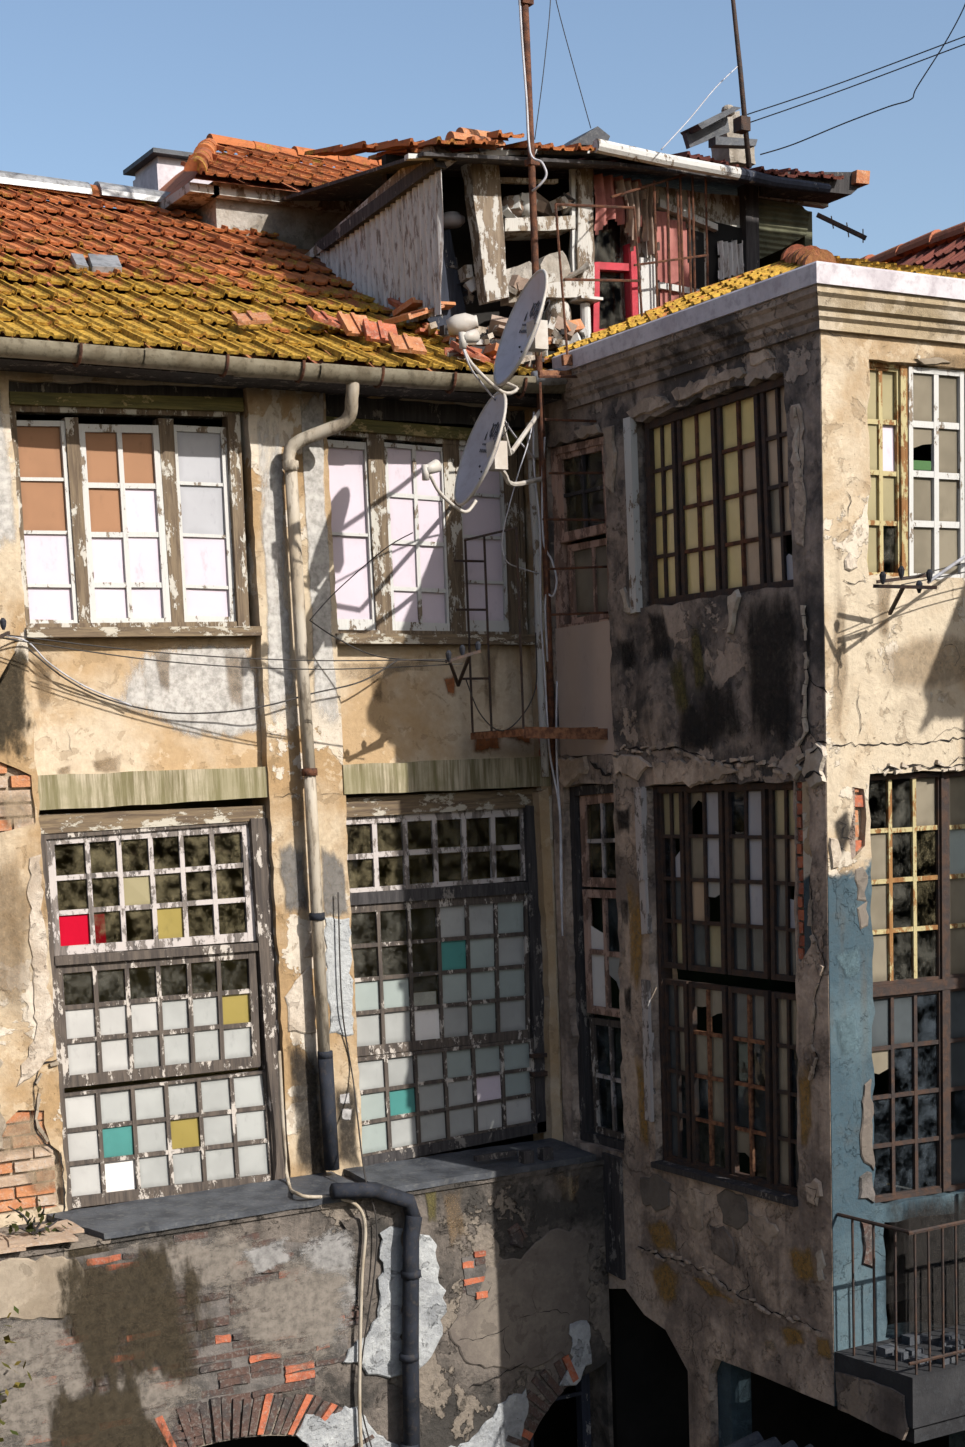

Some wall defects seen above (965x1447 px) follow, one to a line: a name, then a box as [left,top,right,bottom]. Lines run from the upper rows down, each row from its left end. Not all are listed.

leakage [648,614,671,660]
leakage [679,596,794,749]
flaking render [0,762,35,832]
flaking render [17,854,55,1087]
flaking render [285,917,354,1037]
crack [807,877,825,1080]
leakage [68,1242,109,1258]
leakage [131,1229,357,1369]
flaking render [0,1105,592,1447]
leakage [0,1317,201,1447]